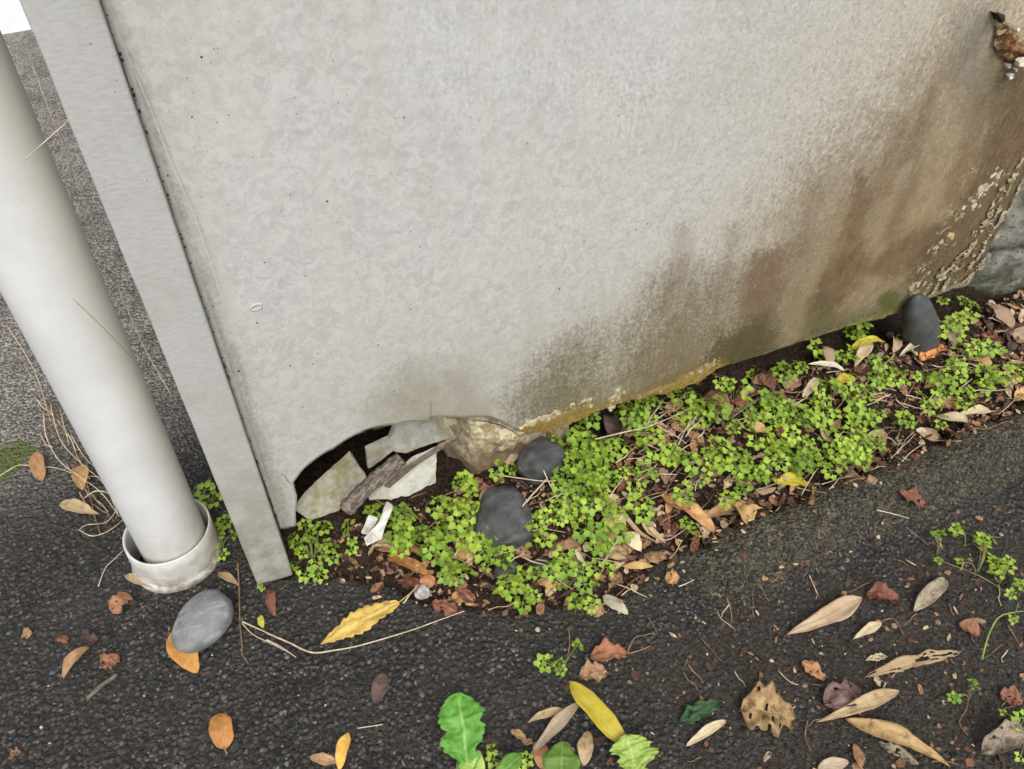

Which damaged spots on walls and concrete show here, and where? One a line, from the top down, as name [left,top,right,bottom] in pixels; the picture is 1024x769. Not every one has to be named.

peeling [899,158,1024,297]
damp [532,283,840,417]
flaking render [361,501,393,546]